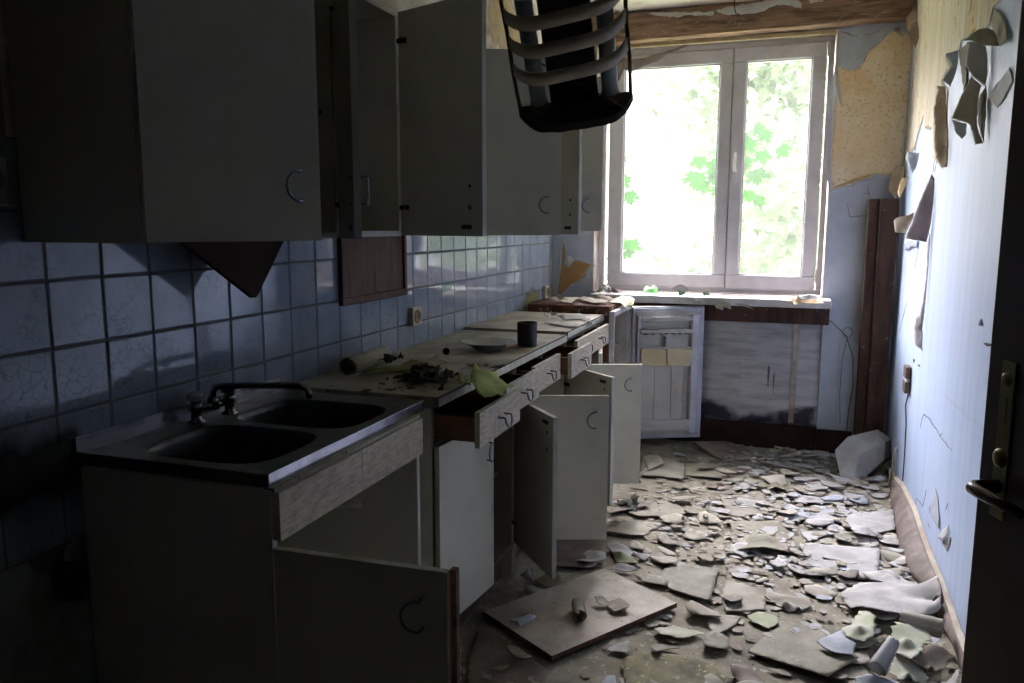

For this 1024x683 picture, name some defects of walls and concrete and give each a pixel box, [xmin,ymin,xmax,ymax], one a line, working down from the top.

flaking render [649,0,823,18]
peeling [827,25,913,194]
peeling [555,239,595,297]
peeling [937,525,950,551]